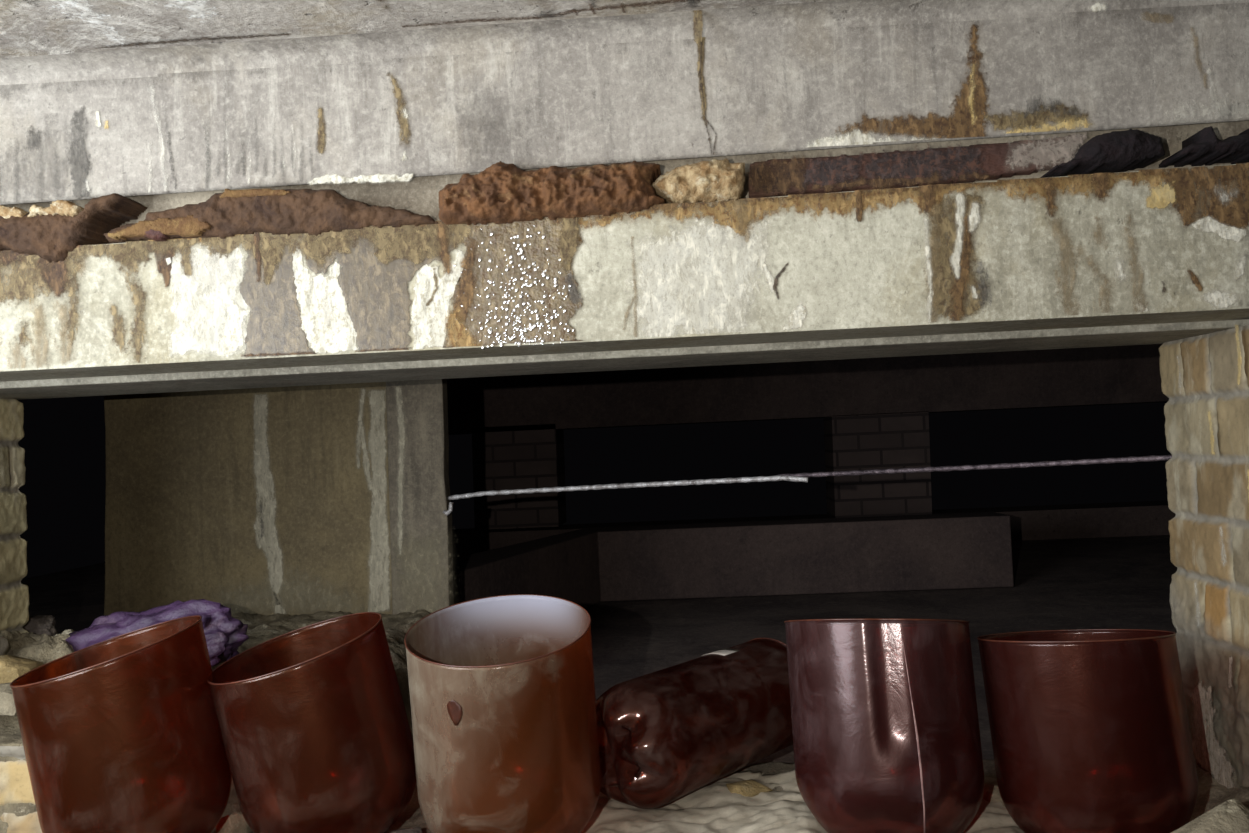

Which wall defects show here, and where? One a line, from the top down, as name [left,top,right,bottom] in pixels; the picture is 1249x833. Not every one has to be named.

crack [402,0,717,155]
rust [0,24,1249,363]
water stain [170,217,583,358]